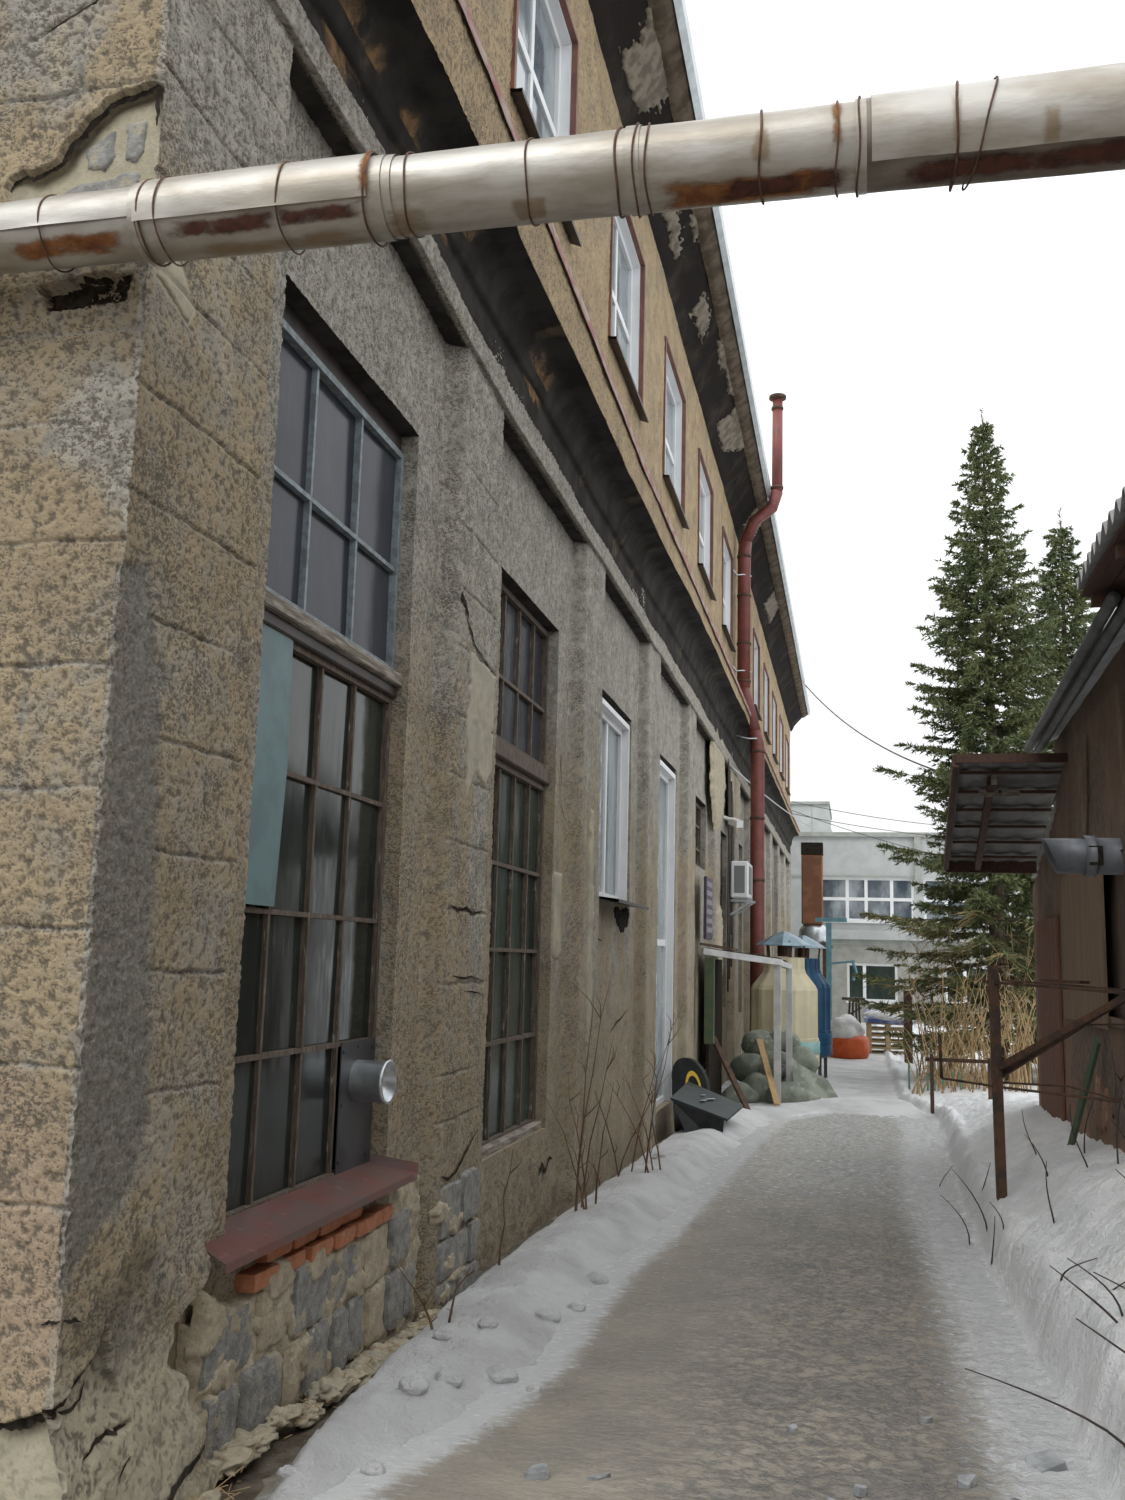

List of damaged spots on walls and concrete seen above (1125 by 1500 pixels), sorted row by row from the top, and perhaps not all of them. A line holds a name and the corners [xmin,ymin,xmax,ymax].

peeling [618,6,669,115]
flaking render [65,121,148,194]
rust [908,140,1125,183]
rust [668,169,841,209]
rust [178,204,356,236]
rust [15,232,117,260]